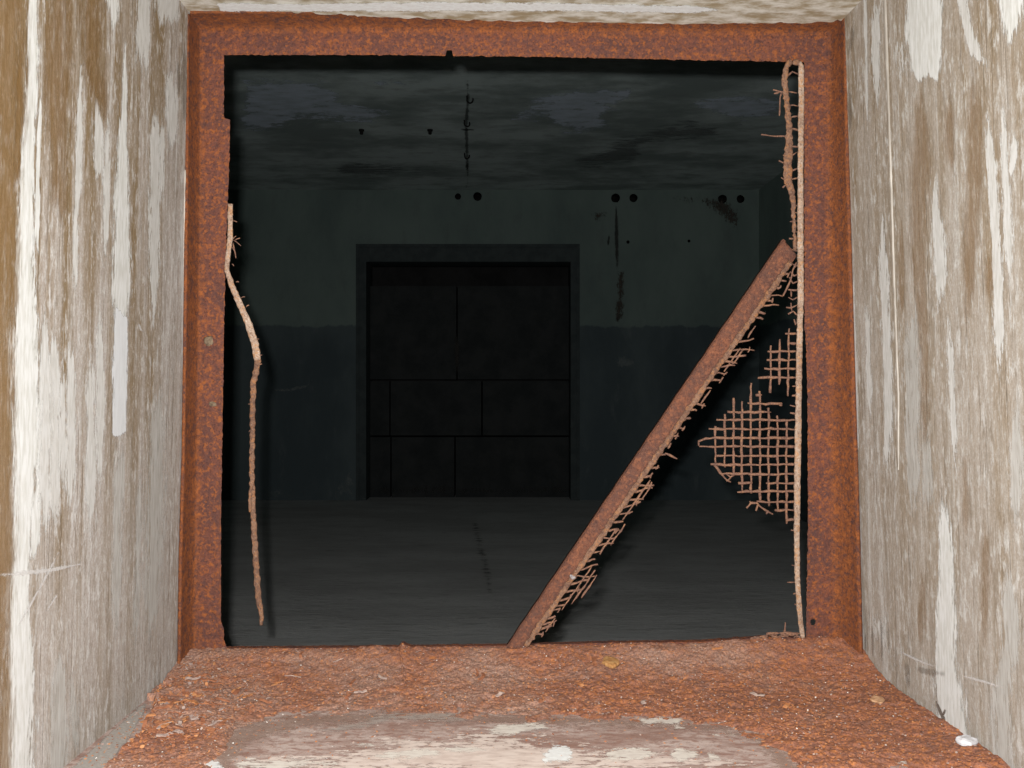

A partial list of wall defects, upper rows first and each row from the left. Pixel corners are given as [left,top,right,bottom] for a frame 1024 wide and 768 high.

water stain [863,0,881,122]
water stain [957,0,987,65]
water stain [147,71,179,326]
water stain [985,103,1019,373]
water stain [0,0,167,768]
water stain [853,177,970,735]
water stain [1009,393,1024,530]
corrosion [217,709,797,768]
water stain [991,569,1020,768]